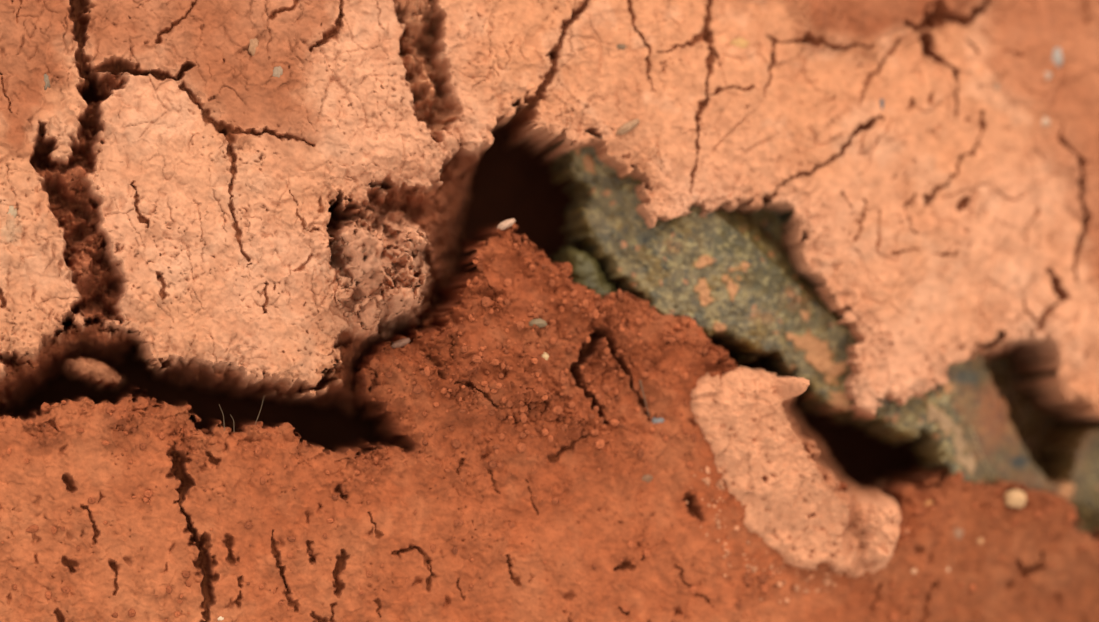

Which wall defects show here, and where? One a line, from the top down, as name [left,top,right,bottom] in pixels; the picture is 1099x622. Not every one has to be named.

crack [67,0,316,314]
spalling [391,0,465,143]
crack [494,0,590,134]
crack [626,0,1027,258]
crack [289,189,326,272]
spalling [0,63,1099,457]
crack [166,441,244,622]
spalling [203,451,222,470]
crack [270,529,351,622]
crack [367,511,466,601]
hole [682,491,706,524]
spalling [867,465,950,510]